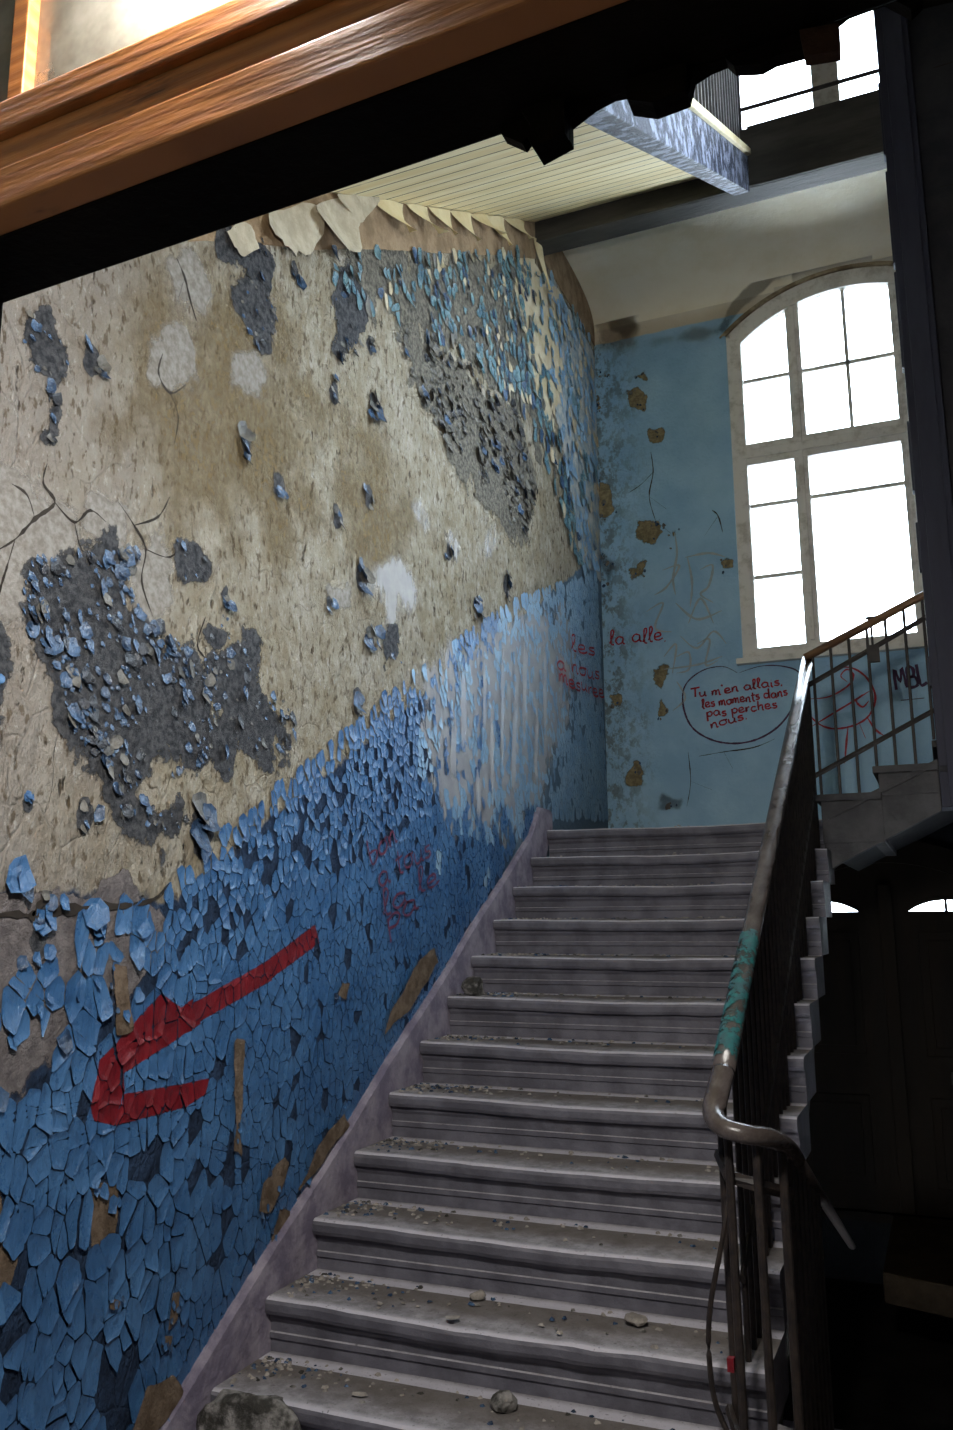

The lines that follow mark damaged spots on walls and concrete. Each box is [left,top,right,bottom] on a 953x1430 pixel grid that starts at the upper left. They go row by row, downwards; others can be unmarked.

crack [0,465,175,616]
peeling [720,558,733,574]
peeling [0,193,680,1430]